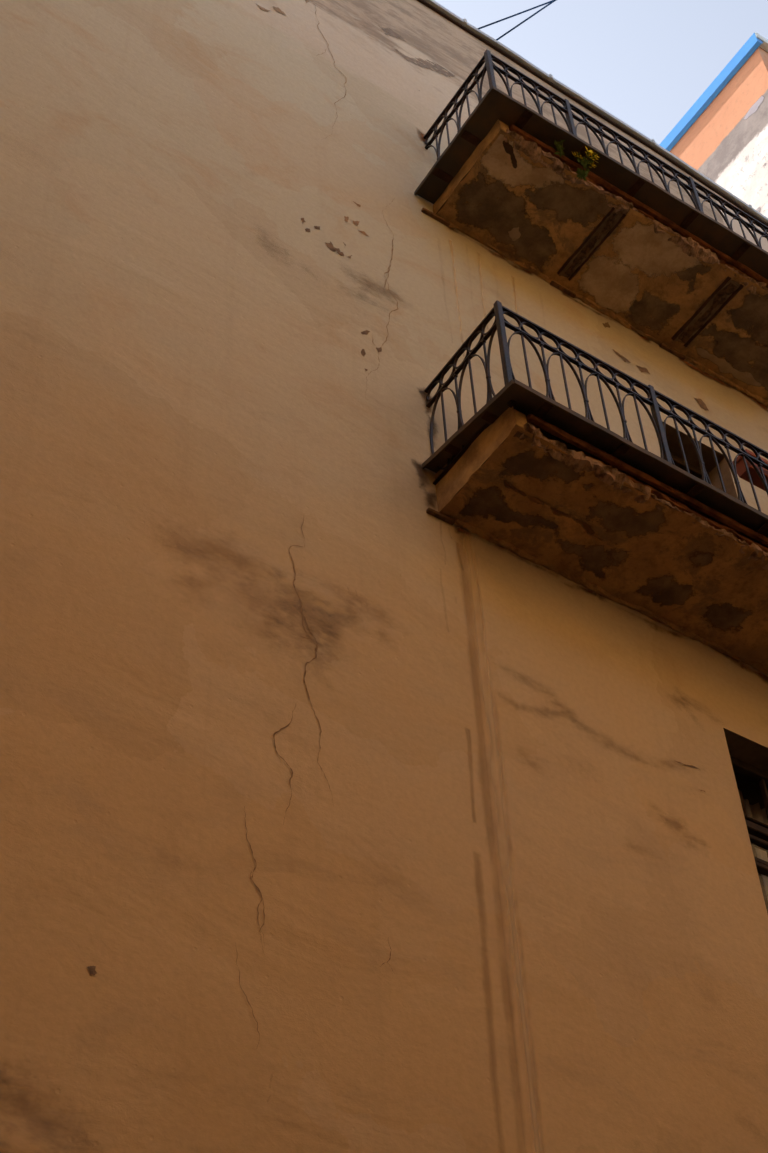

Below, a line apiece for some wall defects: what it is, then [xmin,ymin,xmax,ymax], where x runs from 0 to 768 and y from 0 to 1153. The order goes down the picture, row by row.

peeling [455,128,768,390]
crack [273,520,334,825]
peeling [459,423,768,578]
peeling [634,575,696,607]
crack [235,806,265,1044]